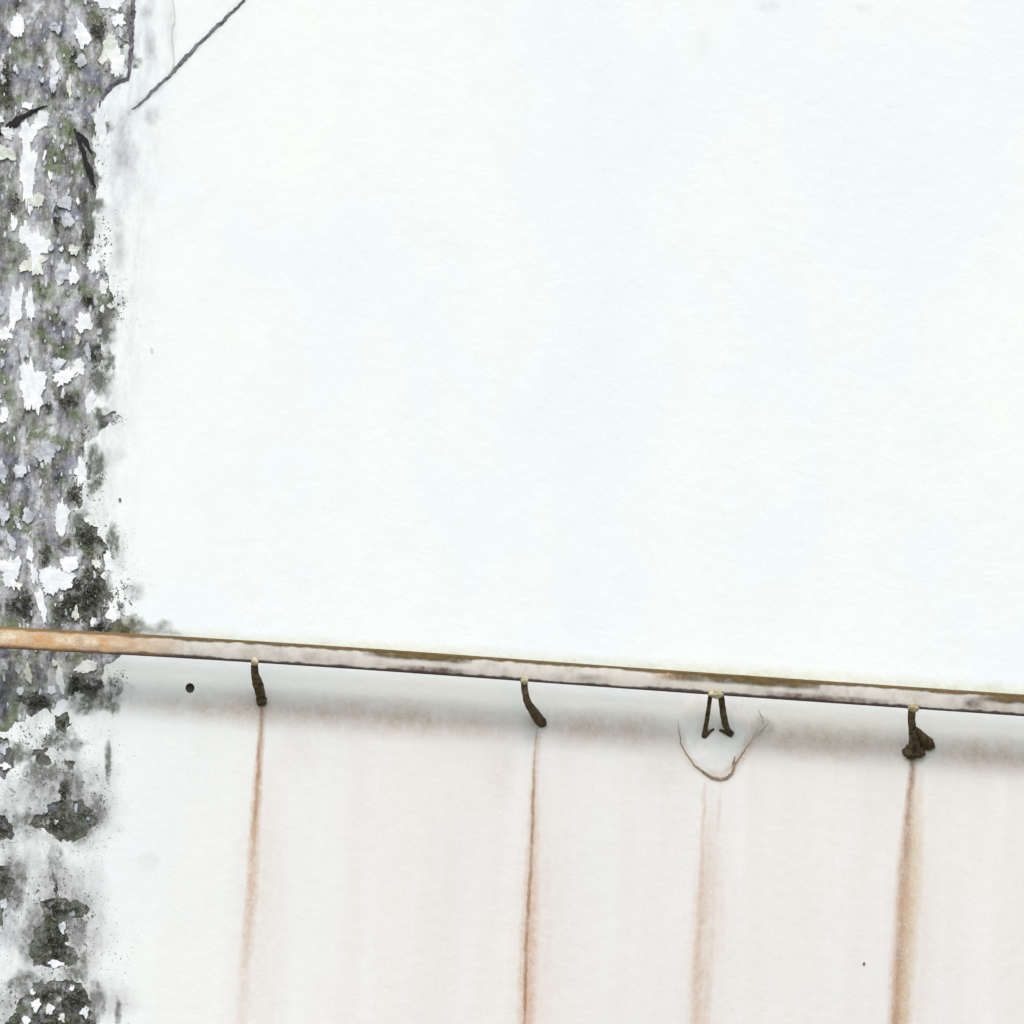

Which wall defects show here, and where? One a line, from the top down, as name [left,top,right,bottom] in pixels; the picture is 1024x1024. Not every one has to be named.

crack [98,0,245,109]
peeling [0,0,151,1024]
corrosion [0,626,1024,716]
corrosion [251,733,263,853]
corrosion [524,871,533,1024]
corrosion [892,960,903,1024]